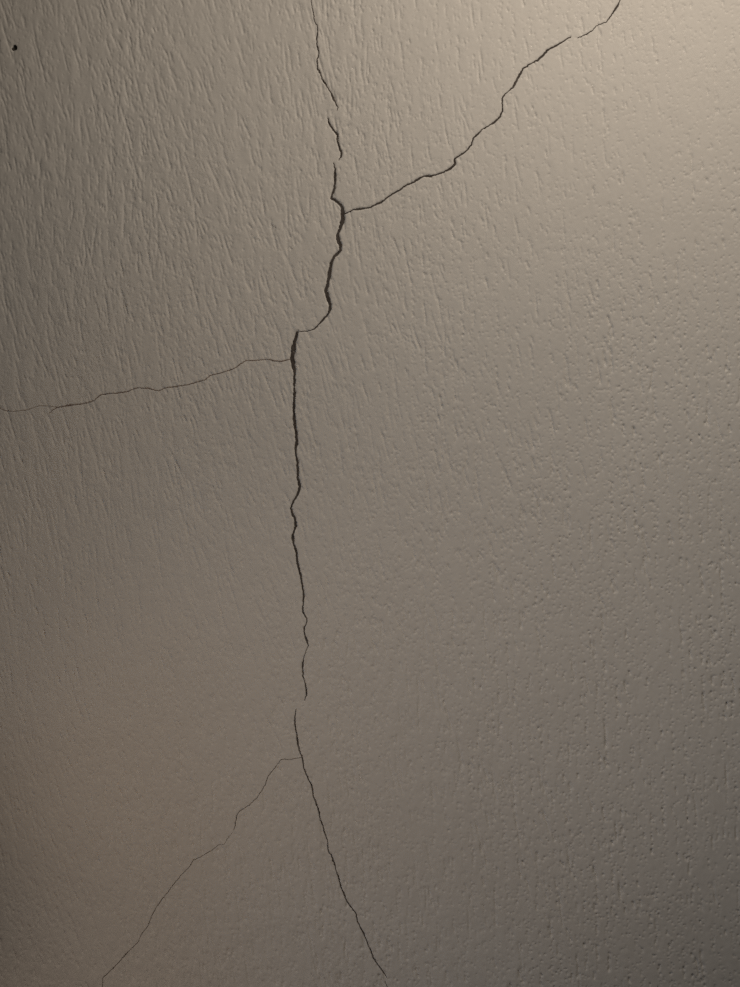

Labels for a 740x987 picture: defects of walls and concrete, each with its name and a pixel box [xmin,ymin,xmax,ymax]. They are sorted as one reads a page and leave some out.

crack [1,0,620,700]
crack [102,710,387,986]